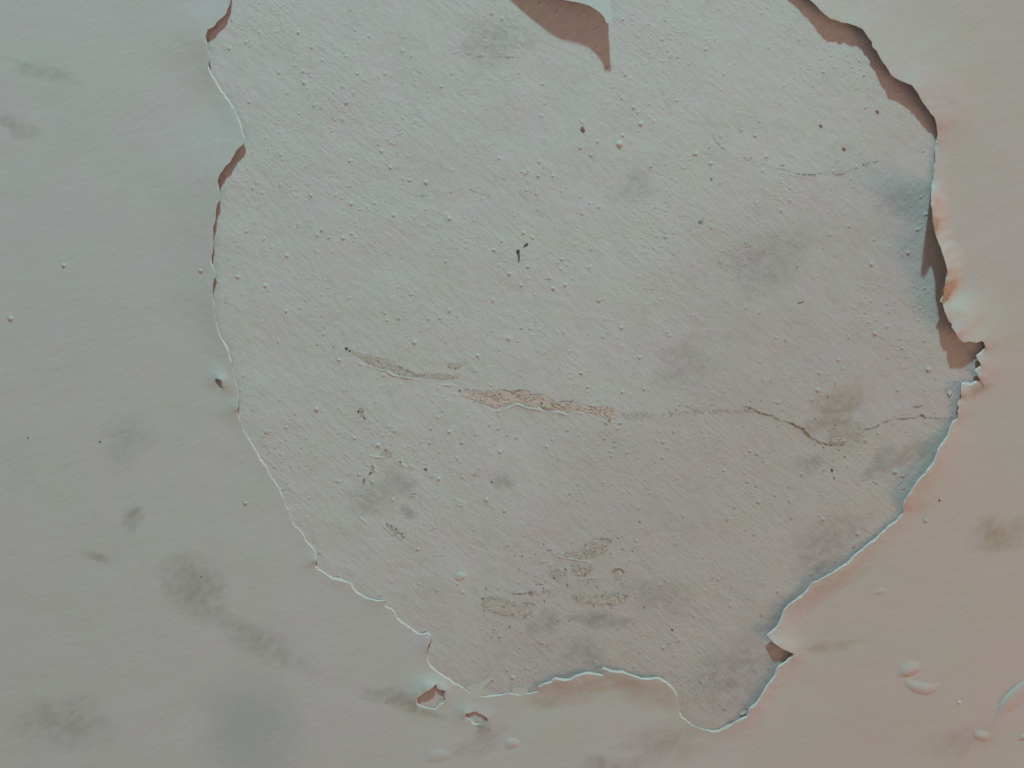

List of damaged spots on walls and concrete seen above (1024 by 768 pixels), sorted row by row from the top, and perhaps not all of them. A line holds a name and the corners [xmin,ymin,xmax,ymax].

peeling [205,0,986,732]
crack [333,346,955,457]